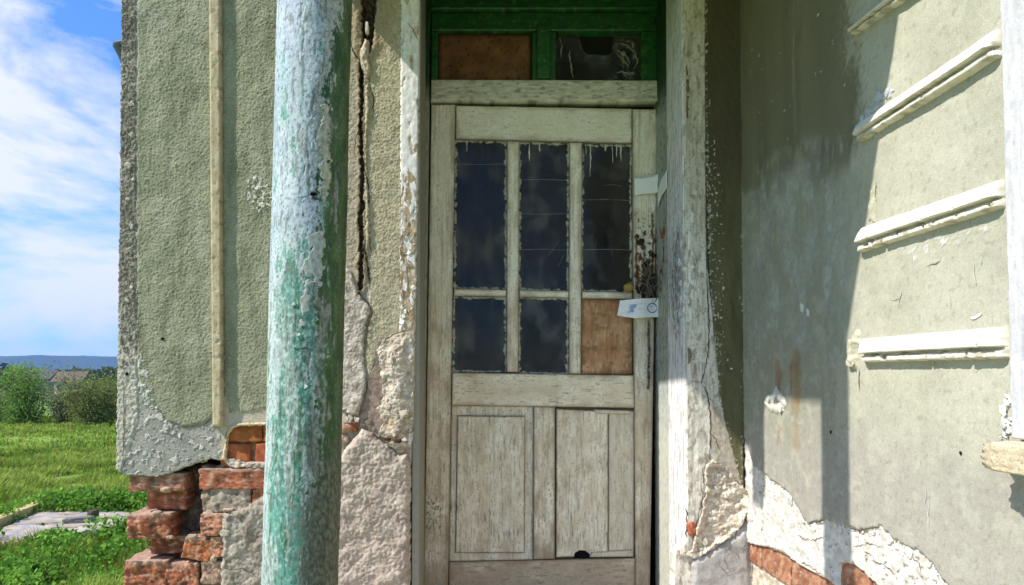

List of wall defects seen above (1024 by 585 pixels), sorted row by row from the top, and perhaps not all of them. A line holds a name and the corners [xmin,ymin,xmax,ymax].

peeling [318,104,333,203]
crack [351,0,377,295]
spalling [119,0,266,585]
peeling [292,231,326,337]
flaking render [342,268,385,443]
peeling [399,154,419,329]
corrosion [634,214,665,294]
spalling [764,386,786,414]
peeling [999,394,1012,440]
spalling [675,439,949,585]